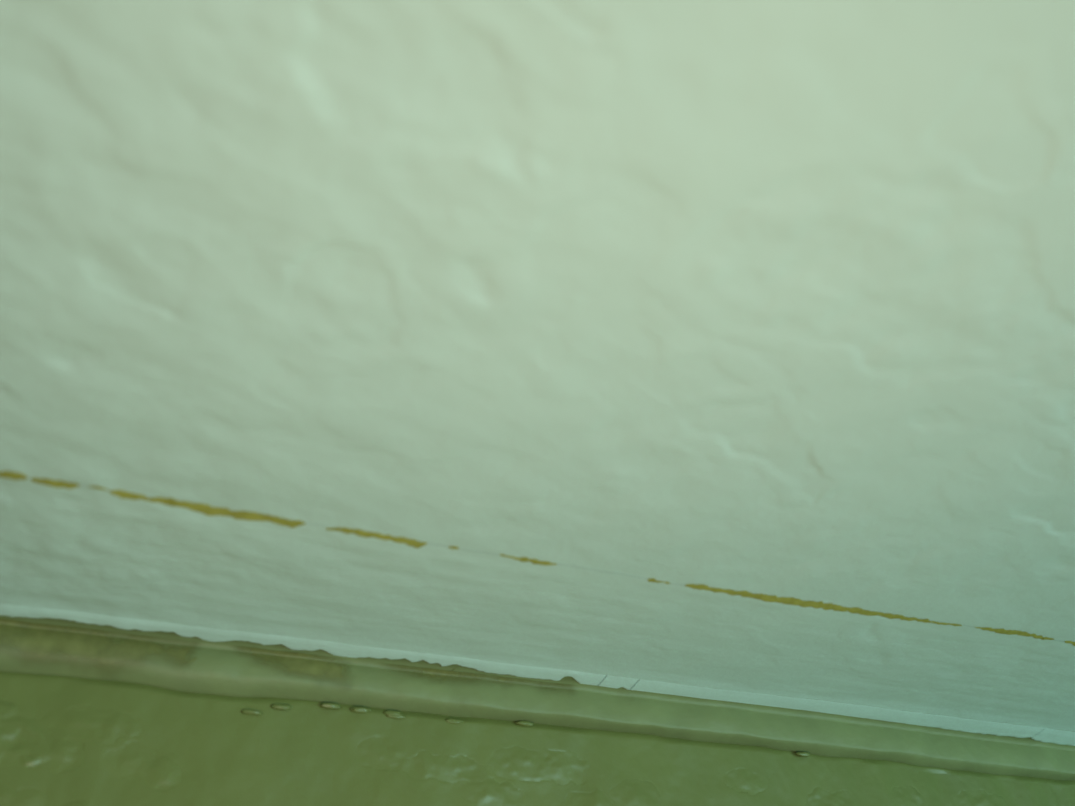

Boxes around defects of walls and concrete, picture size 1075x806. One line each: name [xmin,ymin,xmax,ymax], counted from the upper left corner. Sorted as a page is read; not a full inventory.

crack [0,471,1075,646]